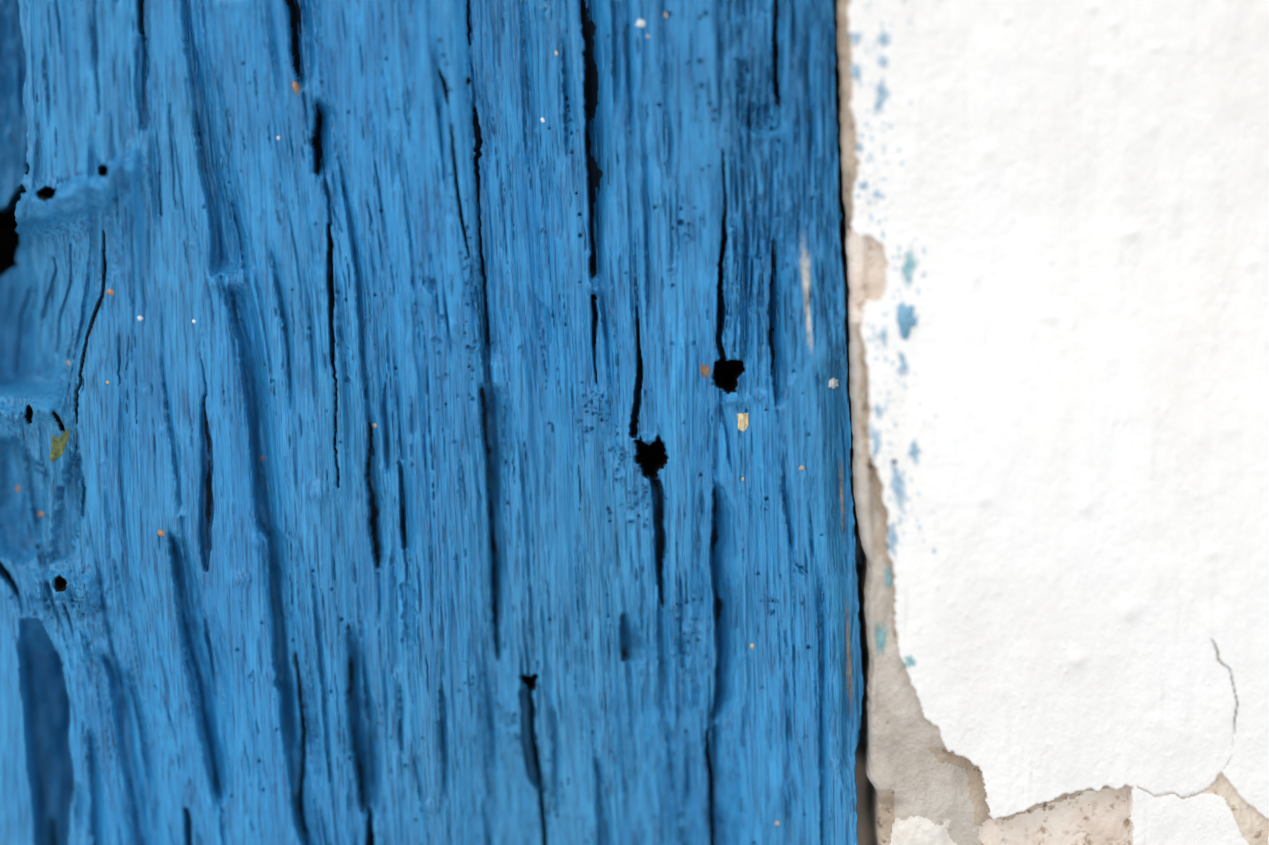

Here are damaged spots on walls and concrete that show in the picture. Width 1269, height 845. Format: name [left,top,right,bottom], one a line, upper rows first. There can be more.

spalling [828,0,1134,845]
peeling [1203,773,1269,845]